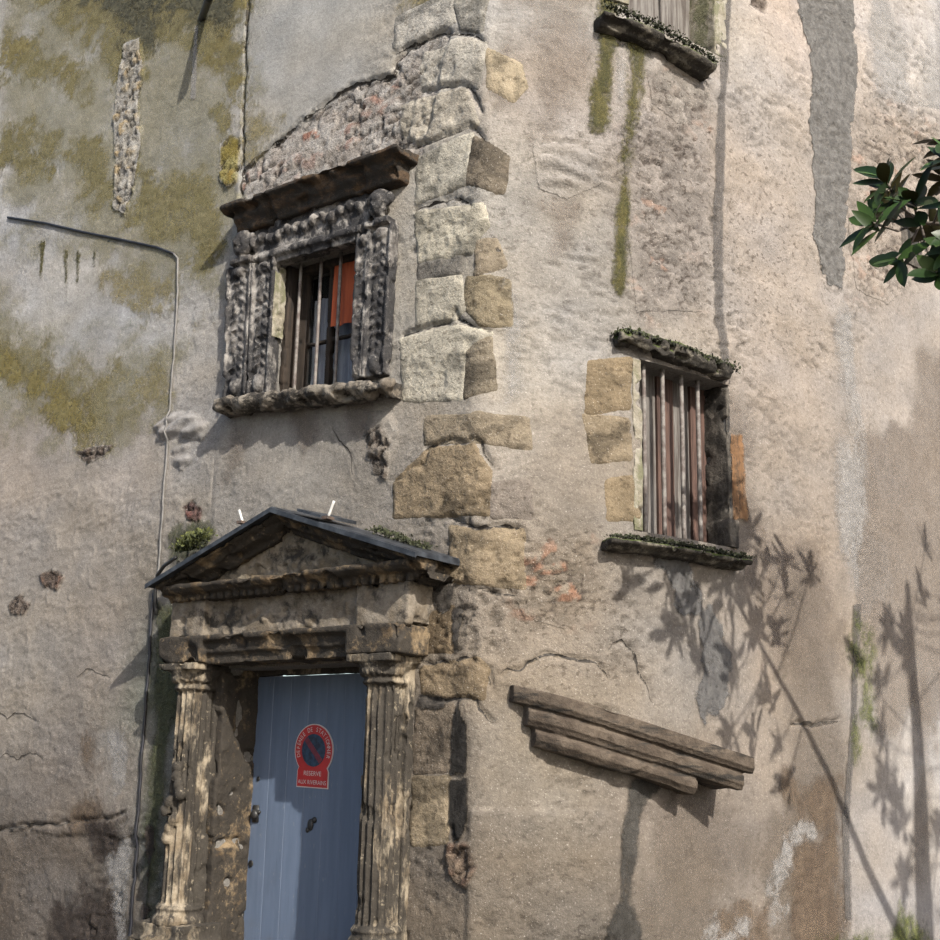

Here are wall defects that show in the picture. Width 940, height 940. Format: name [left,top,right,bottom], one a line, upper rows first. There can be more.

flaking render [112,38,143,213]
flaking render [219,32,452,199]
leakage [612,42,650,295]
leakage [64,250,81,282]
flaking render [75,444,113,462]
leakage [838,448,892,611]
flaking render [7,595,31,614]
flaking render [38,569,65,590]
crack [426,639,653,722]
crack [0,810,125,830]
leakage [46,799,130,940]
flaking render [445,842,476,889]